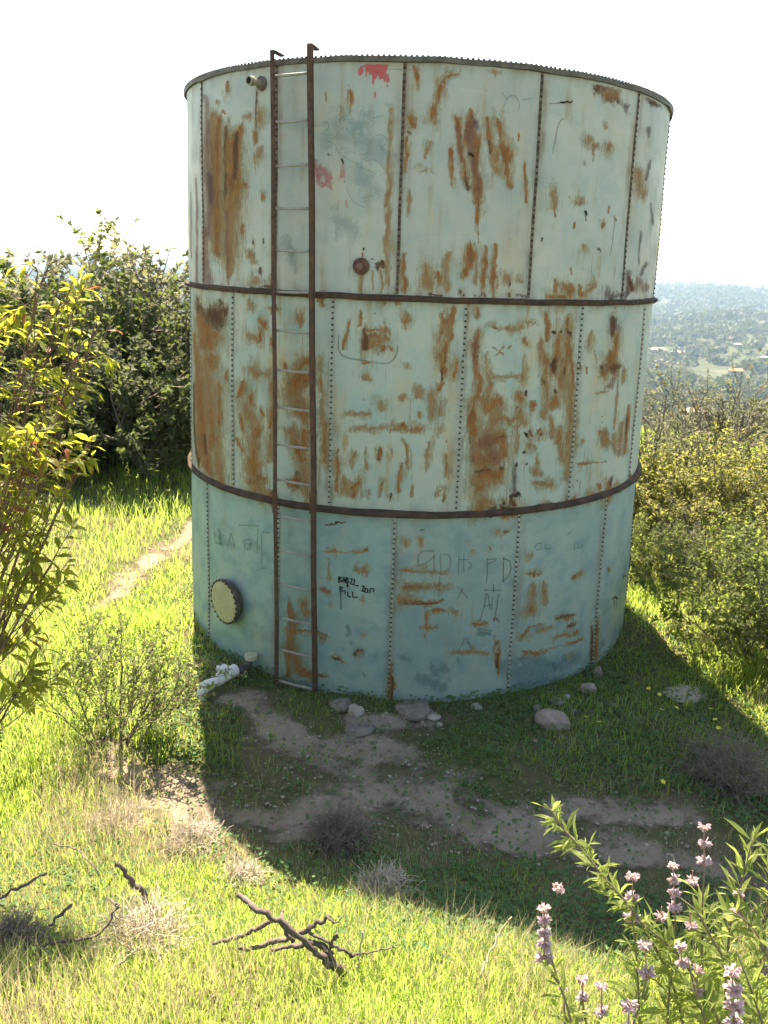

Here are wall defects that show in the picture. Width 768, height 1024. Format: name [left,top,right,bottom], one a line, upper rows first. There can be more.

rust [404,72,459,170]
rust [193,296,228,483]
rust [190,89,277,347]
rust [235,307,458,503]
rust [342,108,411,382]
rust [421,108,649,533]
rust [284,600,329,679]
rust [396,569,457,641]
rust [519,571,599,661]